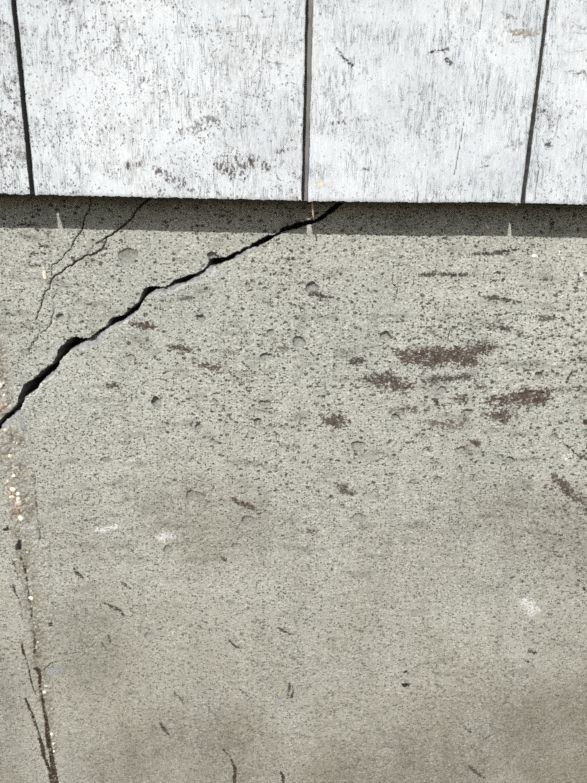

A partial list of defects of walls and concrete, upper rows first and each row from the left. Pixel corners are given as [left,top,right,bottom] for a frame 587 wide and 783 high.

crack [0,198,343,429]